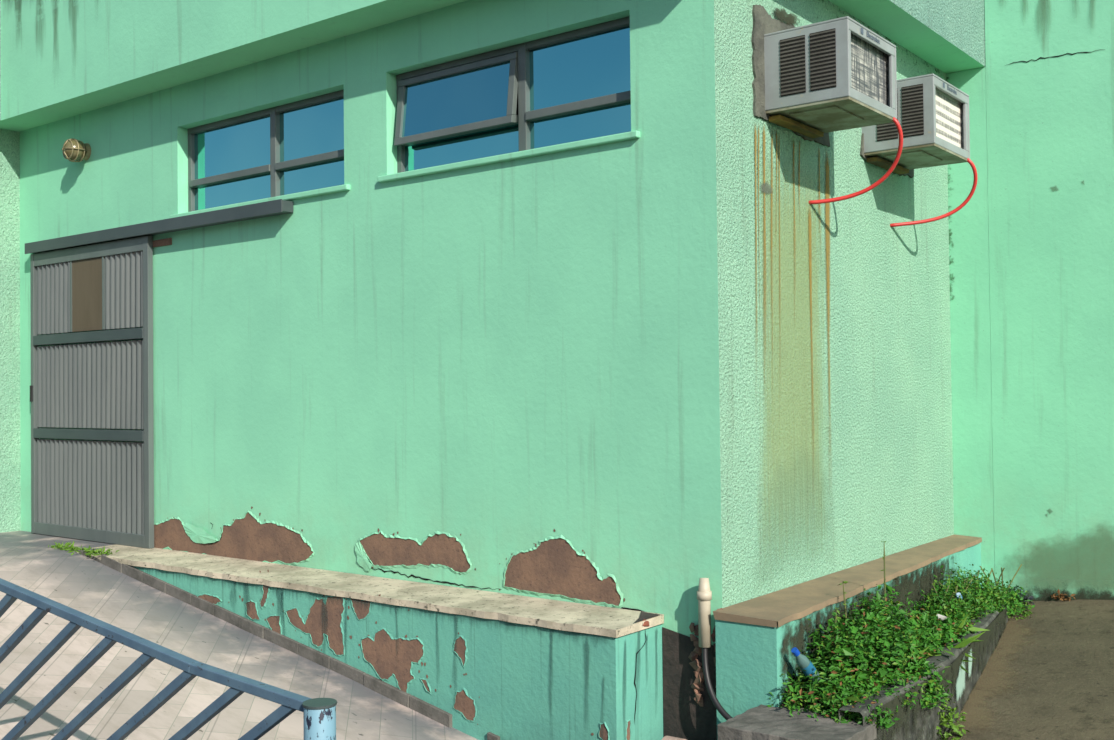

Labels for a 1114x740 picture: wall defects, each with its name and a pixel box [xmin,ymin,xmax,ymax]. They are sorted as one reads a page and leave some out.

corrosion [755,128,800,321]
corrosion [809,151,830,404]
peeling [154,506,436,695]
peeling [355,528,476,575]
peeling [499,529,625,608]
peeling [450,632,480,723]
peeling [591,722,610,740]
spalling [634,611,717,740]